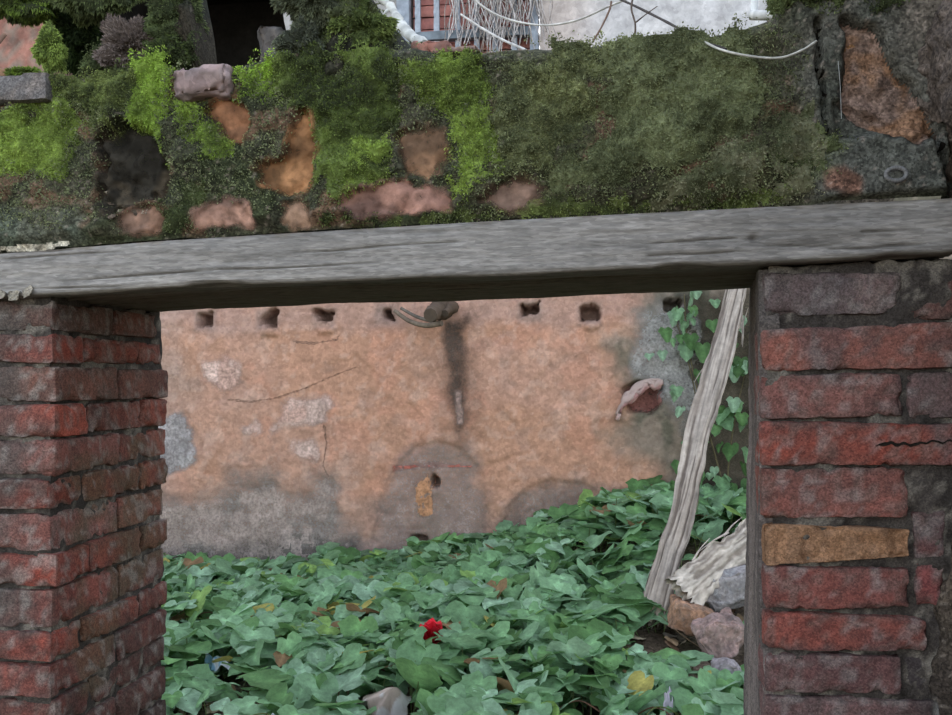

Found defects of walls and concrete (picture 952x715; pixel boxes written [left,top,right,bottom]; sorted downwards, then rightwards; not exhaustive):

crack [814,27,829,135]
spalling [840,24,934,144]
damp [444,321,466,427]
crack [876,439,952,447]